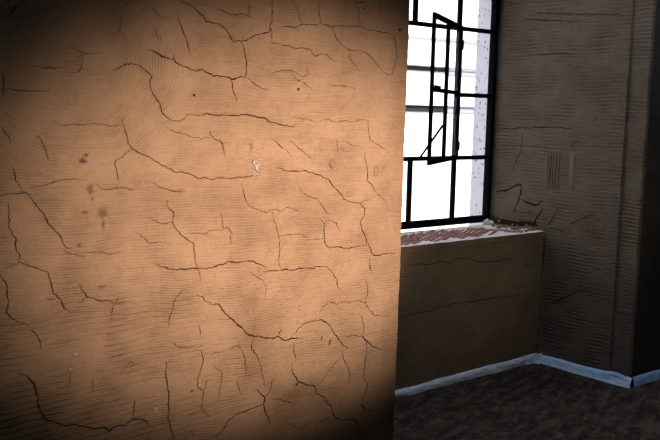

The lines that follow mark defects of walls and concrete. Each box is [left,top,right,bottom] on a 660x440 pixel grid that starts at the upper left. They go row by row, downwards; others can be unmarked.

crack [148,0,397,98]
crack [1,63,522,440]
crack [496,127,593,311]